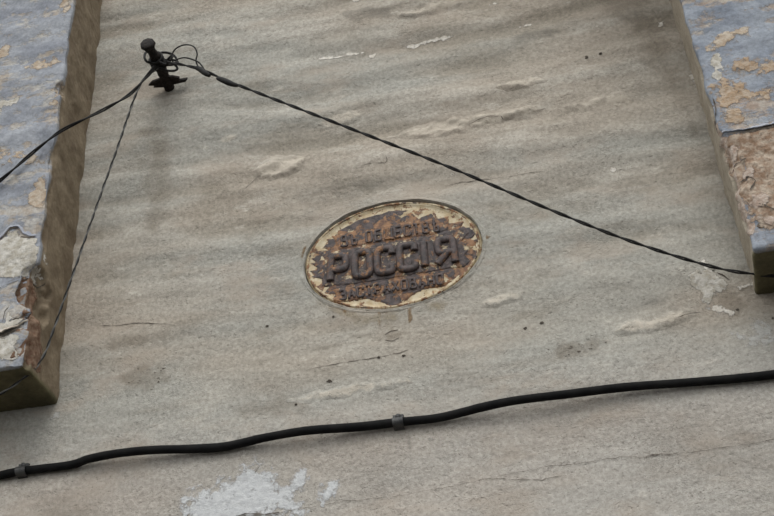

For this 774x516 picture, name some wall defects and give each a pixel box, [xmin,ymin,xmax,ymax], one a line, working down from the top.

peeling [705,26,774,237]
peeling [0,224,48,373]
peeling [179,460,310,516]
peeling [317,479,340,507]